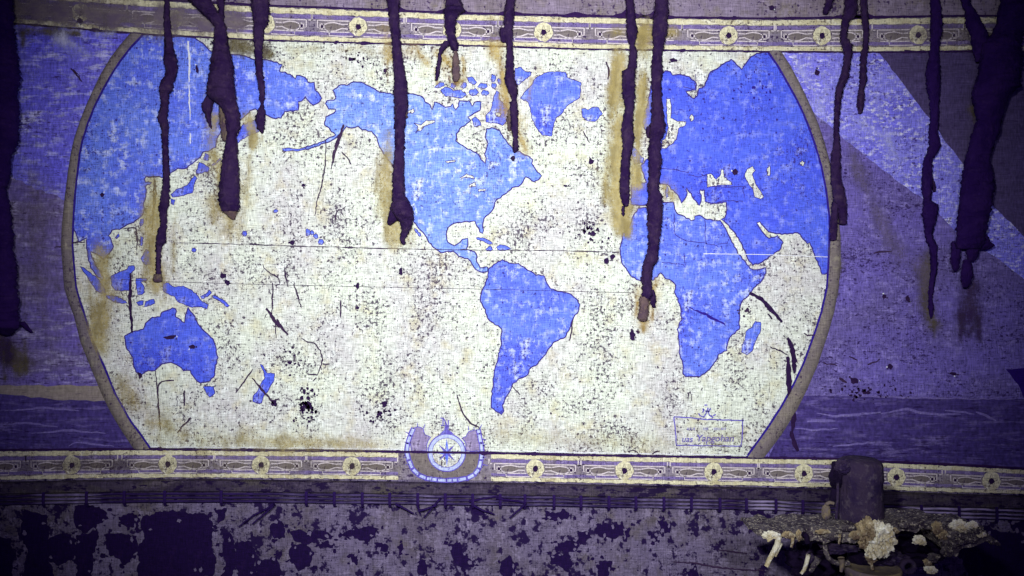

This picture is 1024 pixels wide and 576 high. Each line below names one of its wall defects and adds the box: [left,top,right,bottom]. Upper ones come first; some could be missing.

corrosion [268,4,444,14]
corrosion [14,23,213,48]
corrosion [228,9,972,246]
peeling [465,508,493,520]
peeling [0,505,429,576]
peeling [444,540,478,574]
peeling [498,555,519,576]
peeling [539,508,635,576]
peeling [647,515,671,545]
peeling [683,563,699,576]